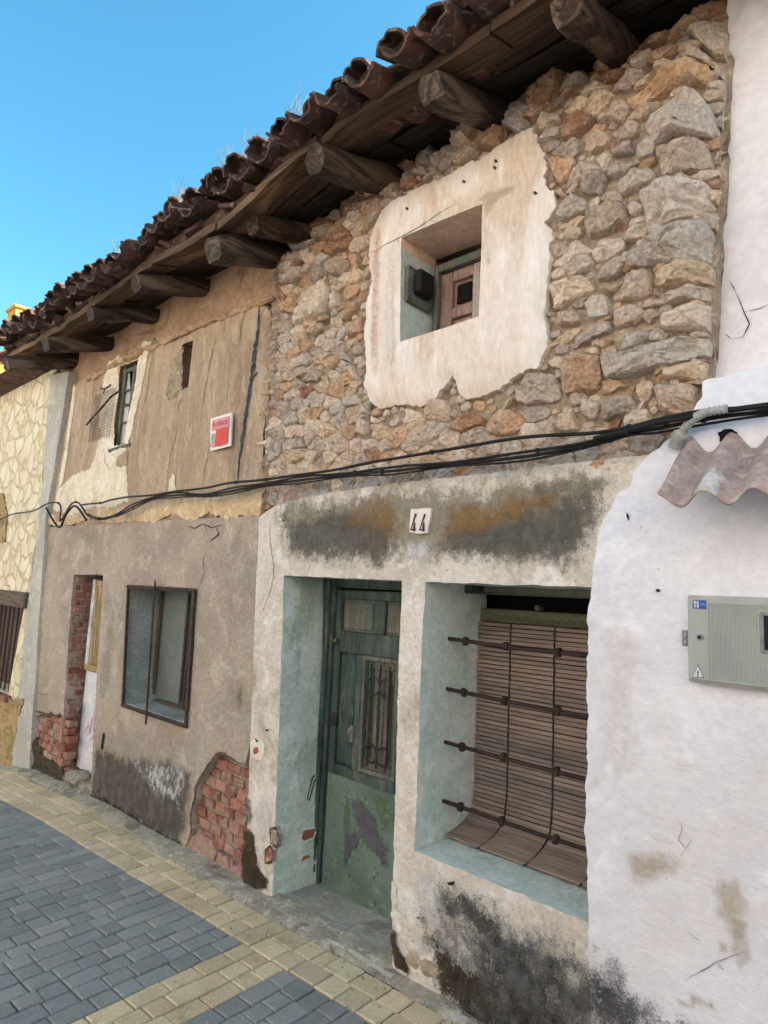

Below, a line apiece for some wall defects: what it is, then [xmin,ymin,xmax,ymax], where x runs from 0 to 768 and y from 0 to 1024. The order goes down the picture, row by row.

crack [727,282,768,339]
crack [165,297,266,487]
crack [187,523,227,583]
water stain [278,458,603,573]
spalling [31,700,91,795]
water stain [90,749,189,844]
spalling [184,738,264,878]
spalling [264,826,283,865]
water stain [416,879,684,1024]